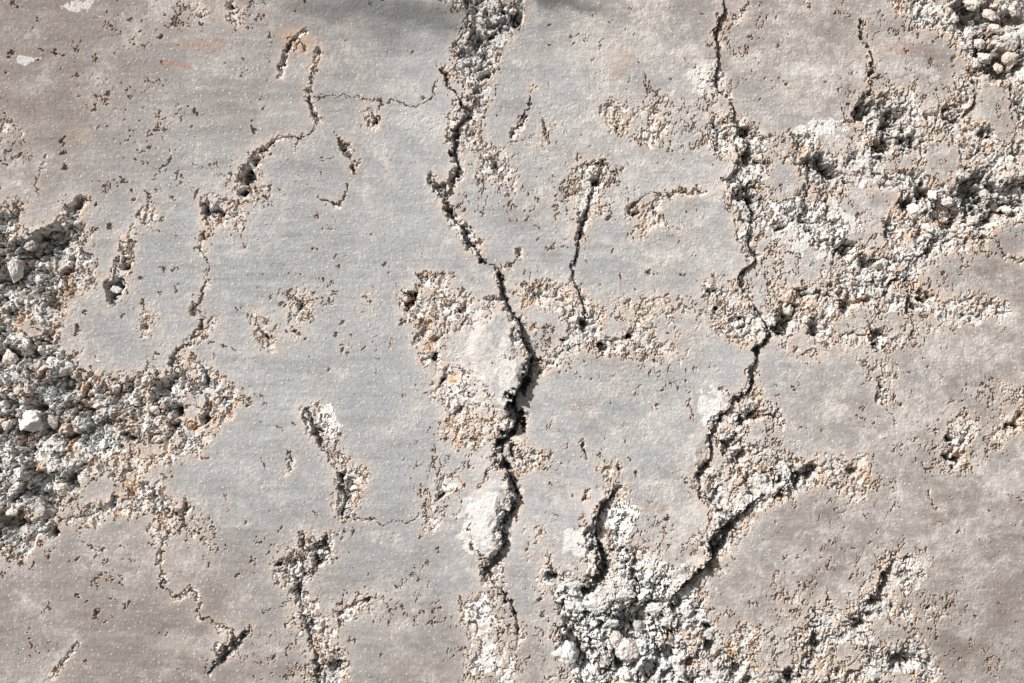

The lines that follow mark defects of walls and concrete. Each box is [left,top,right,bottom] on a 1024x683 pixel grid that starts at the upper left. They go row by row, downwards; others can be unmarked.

crack [155,154,173,177]
spalling [701,0,1024,366]
spalling [0,191,253,563]
crack [151,465,421,683]
crack [259,28,624,637]
spalling [418,475,465,541]
spalling [399,271,506,450]
spalling [505,438,547,475]
crack [627,0,783,617]
spalling [537,510,950,683]